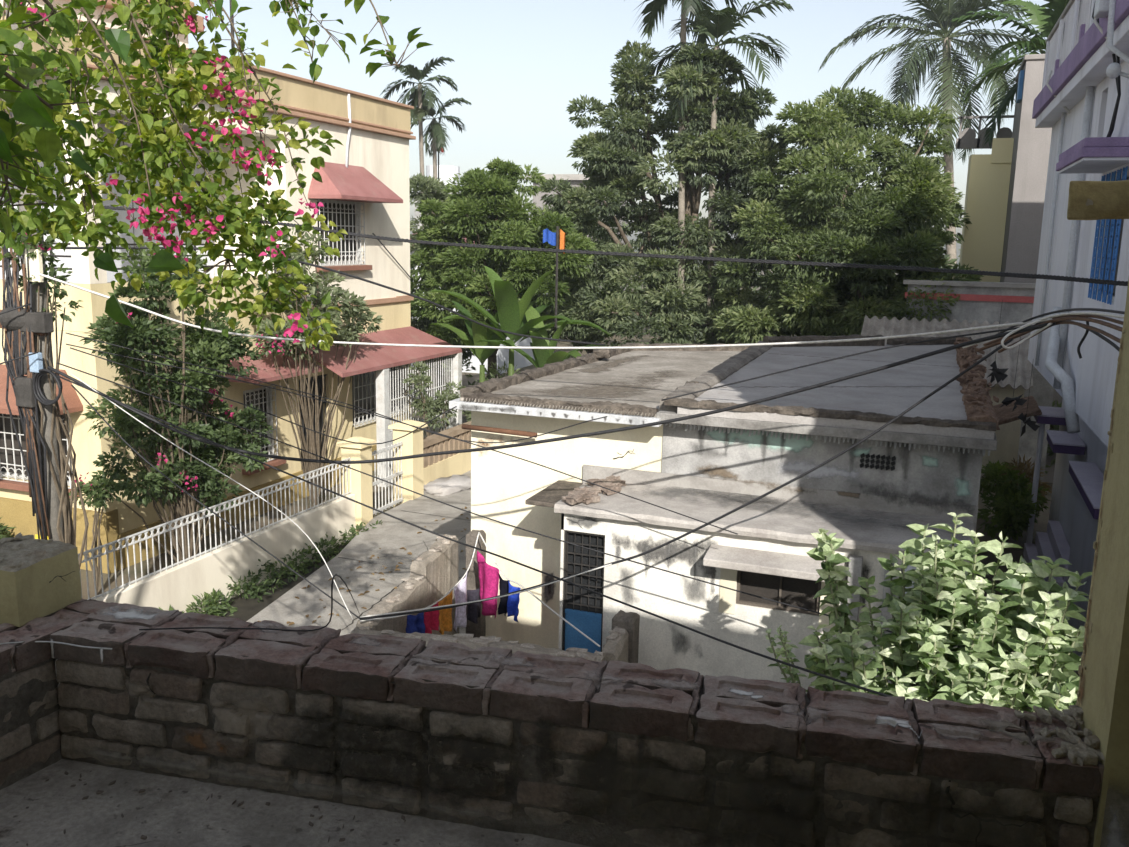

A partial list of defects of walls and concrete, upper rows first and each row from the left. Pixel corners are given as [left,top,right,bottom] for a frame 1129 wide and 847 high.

damp [695,427,729,454]
damp [615,538,716,602]
damp [675,633,687,649]